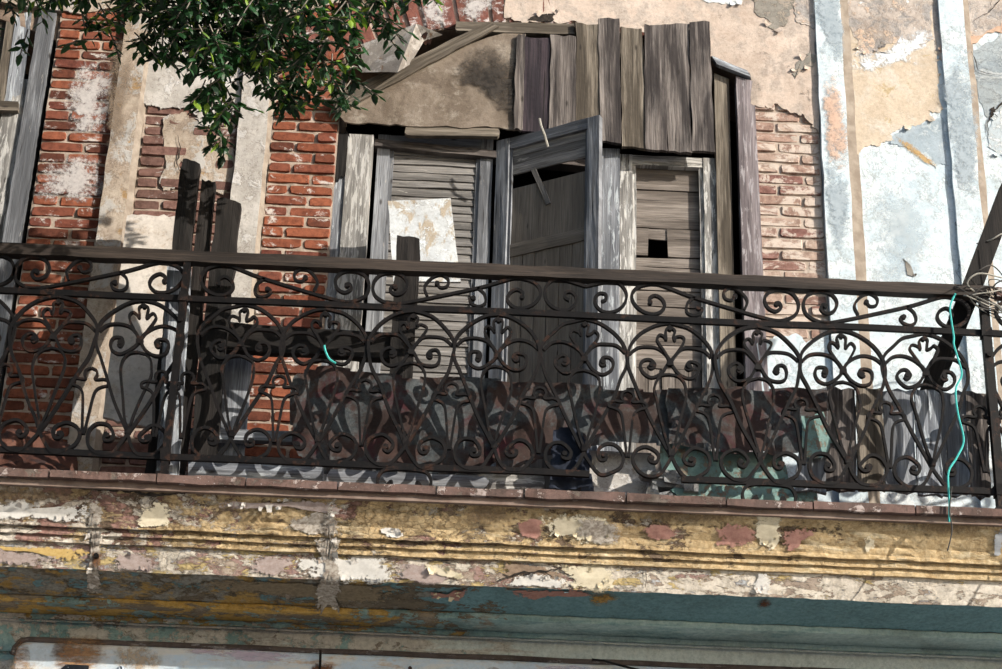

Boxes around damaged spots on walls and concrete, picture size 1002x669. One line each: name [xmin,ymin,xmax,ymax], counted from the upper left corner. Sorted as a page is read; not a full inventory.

damp [459,50,515,115]
flaking render [26,9,125,246]
peeling [703,0,1002,278]
flaking render [764,292,830,342]
flaking render [0,260,91,444]
peeling [0,499,104,601]
peeling [115,552,156,573]
peeling [136,502,172,527]
flaking render [219,498,466,615]
peeling [504,563,620,600]
peeling [516,513,621,545]
peeling [715,510,814,553]